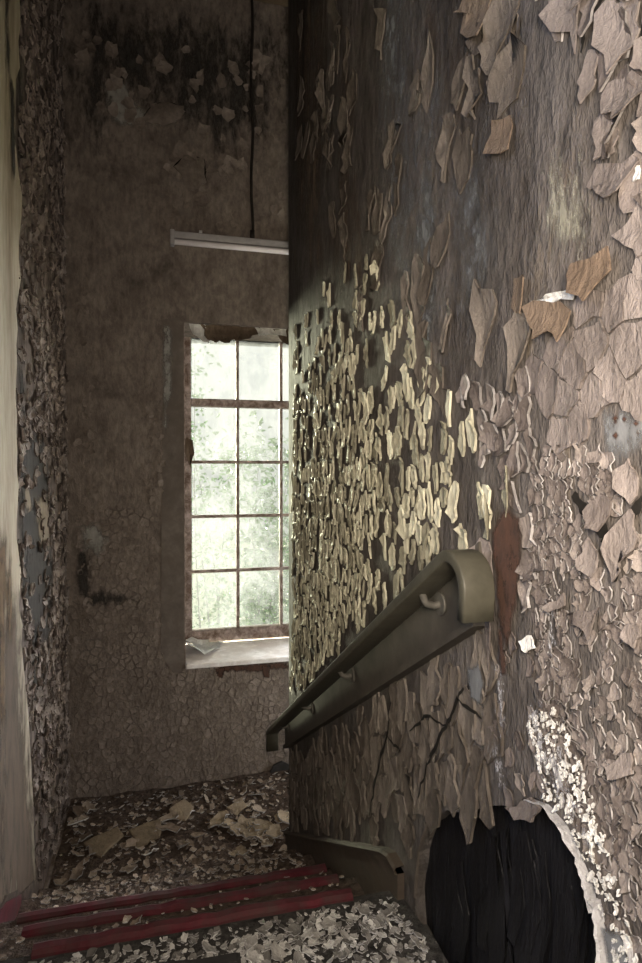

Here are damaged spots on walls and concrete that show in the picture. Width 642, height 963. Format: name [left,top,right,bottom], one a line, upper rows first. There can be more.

peeling [212,49,286,122]
peeling [295,0,358,259]
peeling [373,8,387,60]
peeling [357,28,434,332]
peeling [16,0,157,886]
peeling [185,437,194,468]
peeling [189,323,289,345]
peeling [400,0,642,963]
flaking render [113,787,289,874]
crack [68,501,504,859]
water stain [491,666,506,788]
water stain [526,700,638,963]